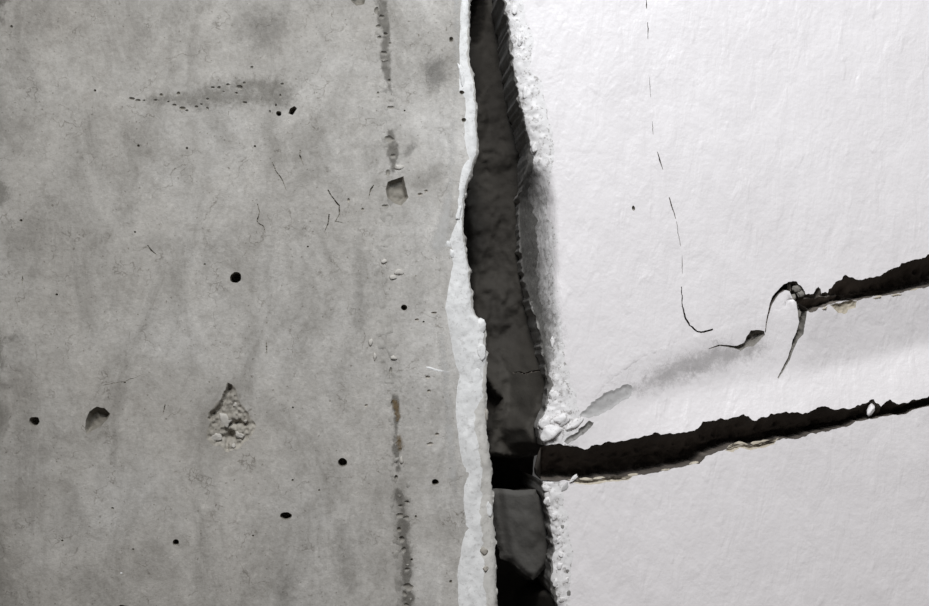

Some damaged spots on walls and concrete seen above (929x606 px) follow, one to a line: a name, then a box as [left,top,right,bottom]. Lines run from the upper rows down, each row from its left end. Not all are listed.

spalling [206,382,256,452]
crack [463,0,929,606]